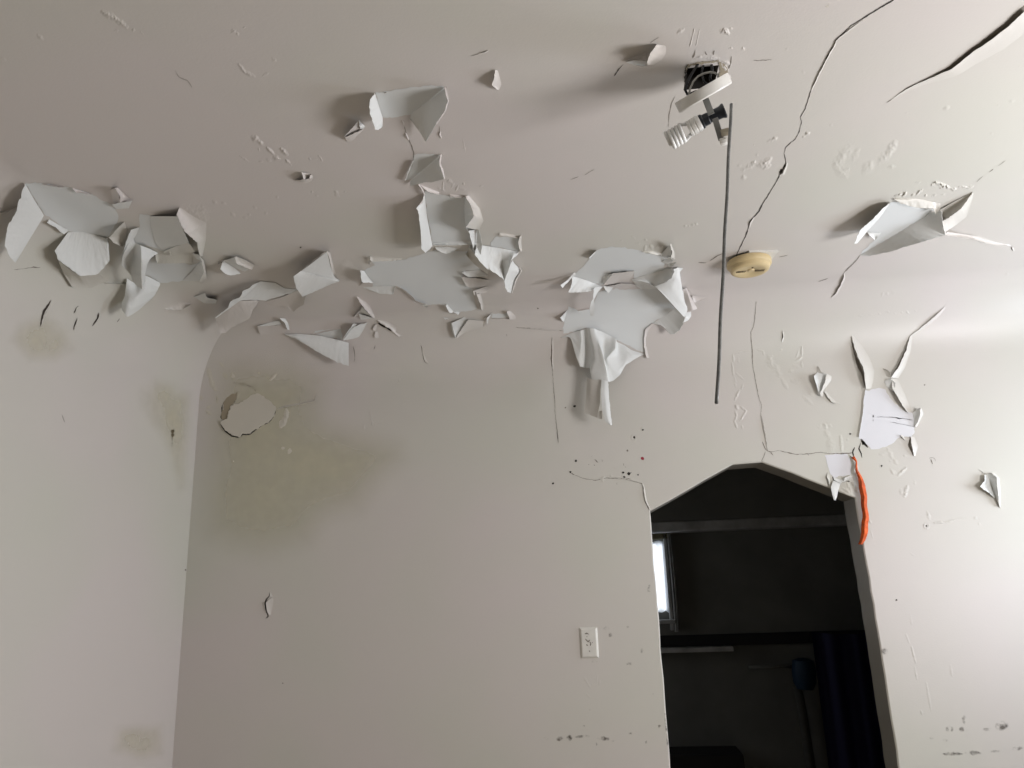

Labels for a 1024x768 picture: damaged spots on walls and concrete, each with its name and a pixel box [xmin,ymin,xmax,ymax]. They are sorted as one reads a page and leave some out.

crack [888,6,1024,102]
crack [698,0,894,263]
peeling [0,85,522,366]
peeling [854,192,1010,256]
spalling [220,392,238,420]
peeling [560,244,708,425]
crack [751,307,851,460]
peeling [849,307,945,456]
crack [575,475,652,510]
peeling [825,454,855,500]
peeling [979,469,1001,508]